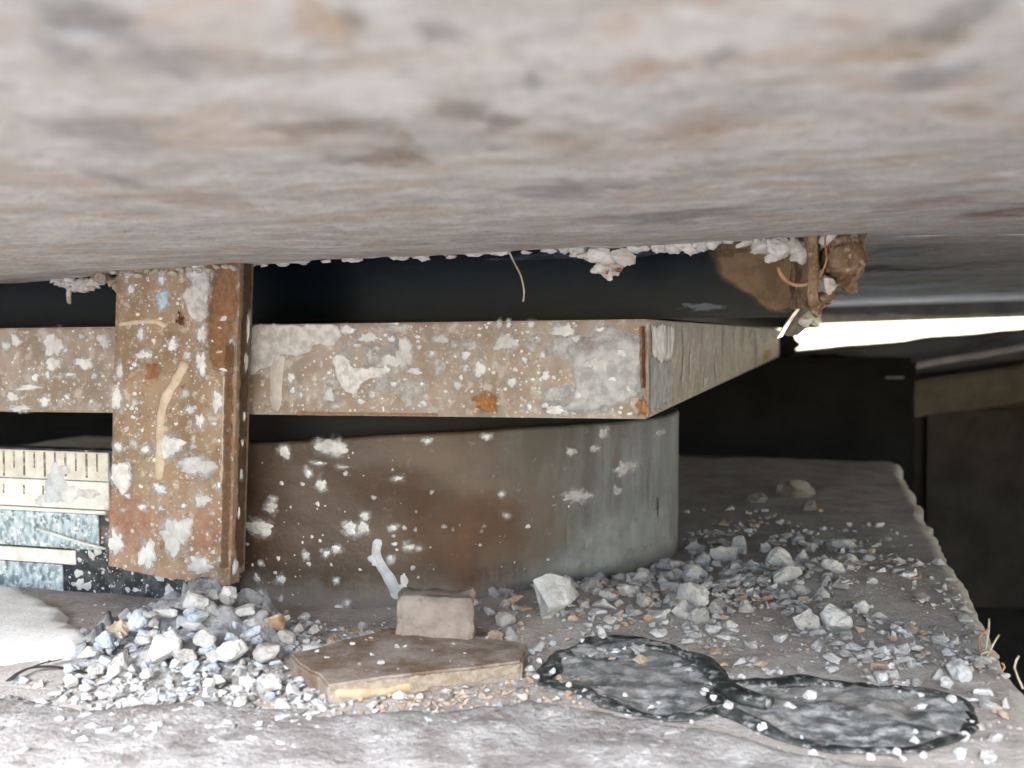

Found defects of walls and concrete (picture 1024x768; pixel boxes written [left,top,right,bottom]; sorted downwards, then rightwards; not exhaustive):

leakage [491,251,577,260]
leakage [683,303,724,311]
rust [146,364,160,379]
rust [198,263,252,569]
rust [472,390,497,412]
rust [635,398,649,416]
rust [109,504,148,542]
leakage [560,504,672,571]